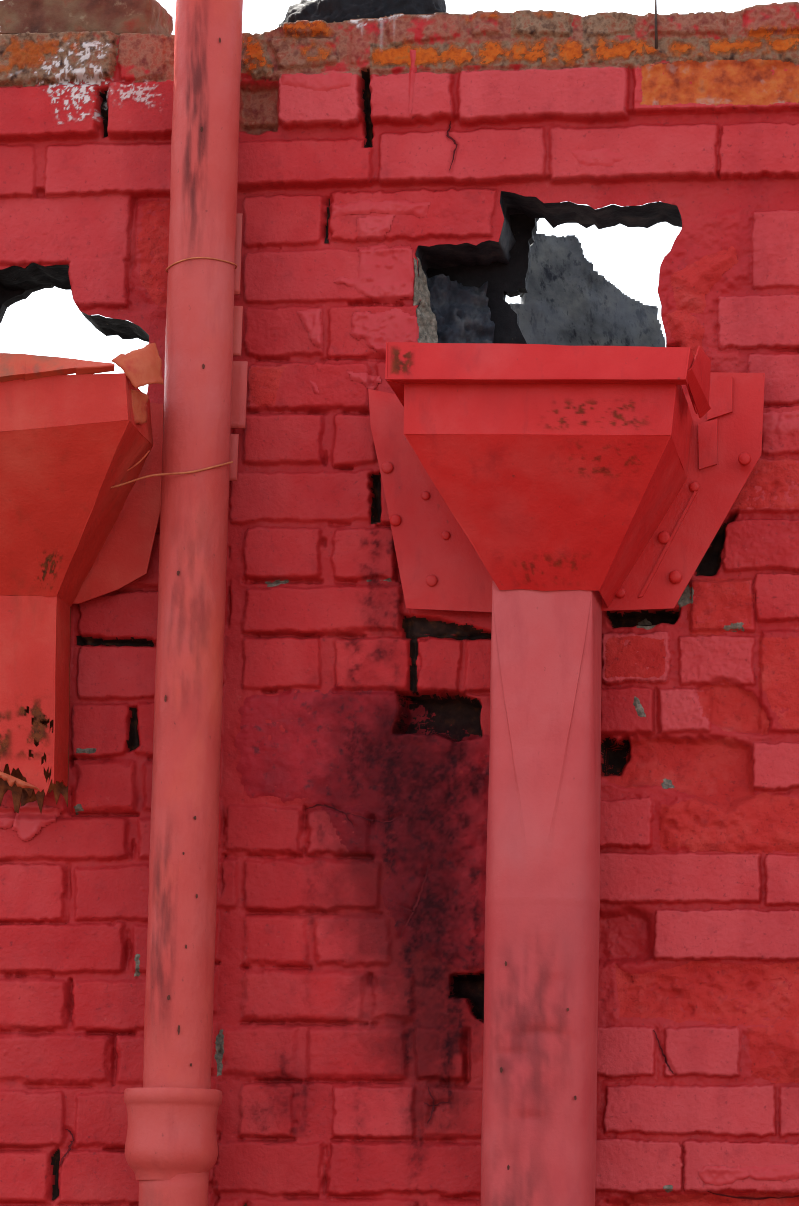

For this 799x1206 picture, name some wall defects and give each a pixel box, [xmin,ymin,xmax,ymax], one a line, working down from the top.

leakage [34,41,151,120]
spalling [605,456,799,678]
leakage [367,742,482,851]
spalling [601,636,799,854]
crack [60,1129,74,1165]
spalling [610,1185,799,1206]